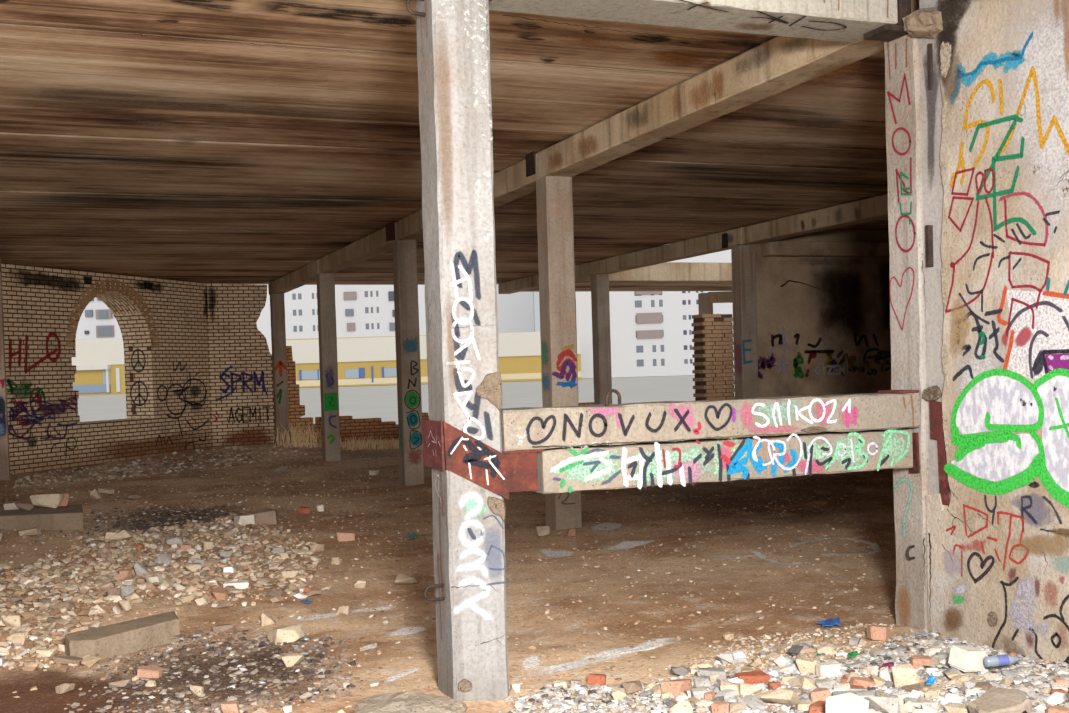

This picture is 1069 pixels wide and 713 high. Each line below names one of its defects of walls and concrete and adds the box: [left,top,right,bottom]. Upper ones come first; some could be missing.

damp [938,0,970,97]
damp [881,266,890,328]